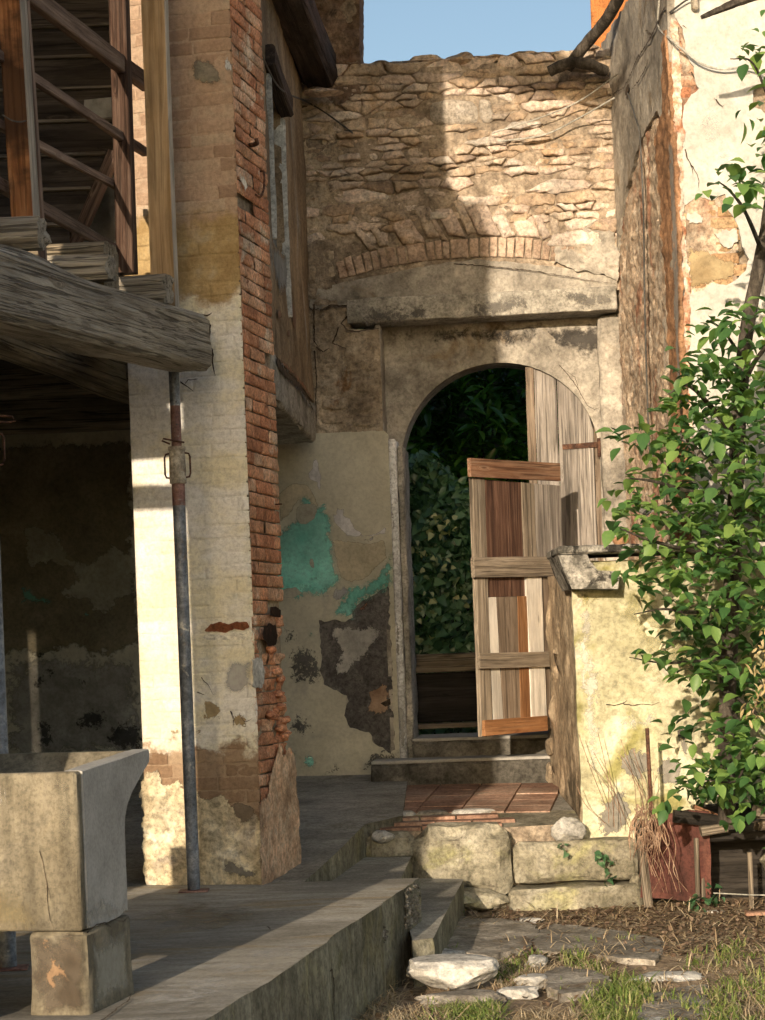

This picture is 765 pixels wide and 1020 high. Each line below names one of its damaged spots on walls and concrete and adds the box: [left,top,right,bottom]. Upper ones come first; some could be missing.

flaking render [654,19,747,558]
spalling [201,606,281,655]
spalling [278,498,405,752]
damp [6,653,142,753]
peeling [204,701,220,719]
spalling [233,803,253,822]
spalling [225,861,256,878]